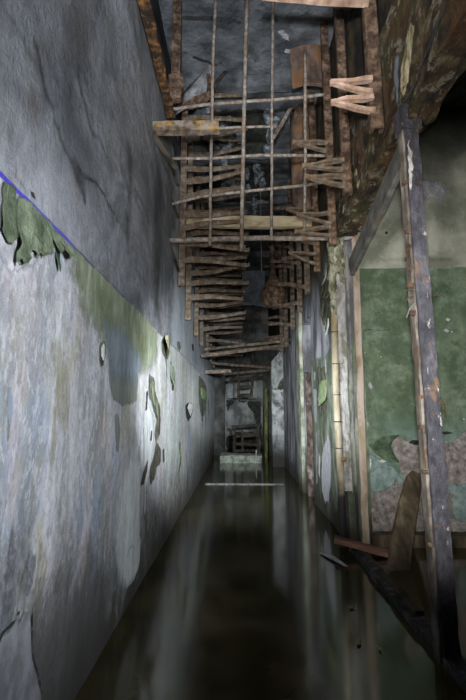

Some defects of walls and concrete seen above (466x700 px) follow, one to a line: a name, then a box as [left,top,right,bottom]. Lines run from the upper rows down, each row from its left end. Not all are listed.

crack [57,126,118,221]
peeling [0,181,78,275]
leakage [102,299,146,405]
peeling [141,373,165,486]
peeling [161,335,181,391]
peeling [185,377,209,426]
peeling [369,435,425,531]
peeling [443,431,466,532]